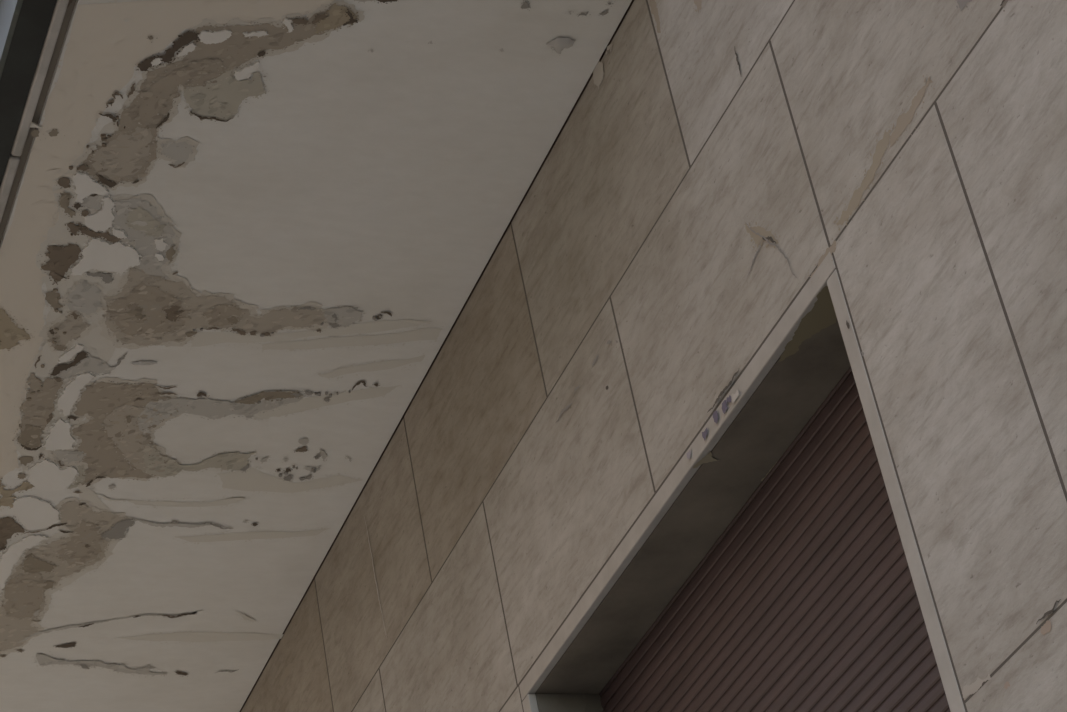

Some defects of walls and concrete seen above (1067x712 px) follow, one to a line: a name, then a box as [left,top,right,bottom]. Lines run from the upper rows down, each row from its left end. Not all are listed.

peeling [41,0,397,321]
crack [746,223,797,278]
spalling [227,316,270,336]
peeling [236,390,329,404]
peeling [0,329,95,592]
peeling [144,438,327,481]
peeling [102,519,135,539]
peeling [36,643,188,676]